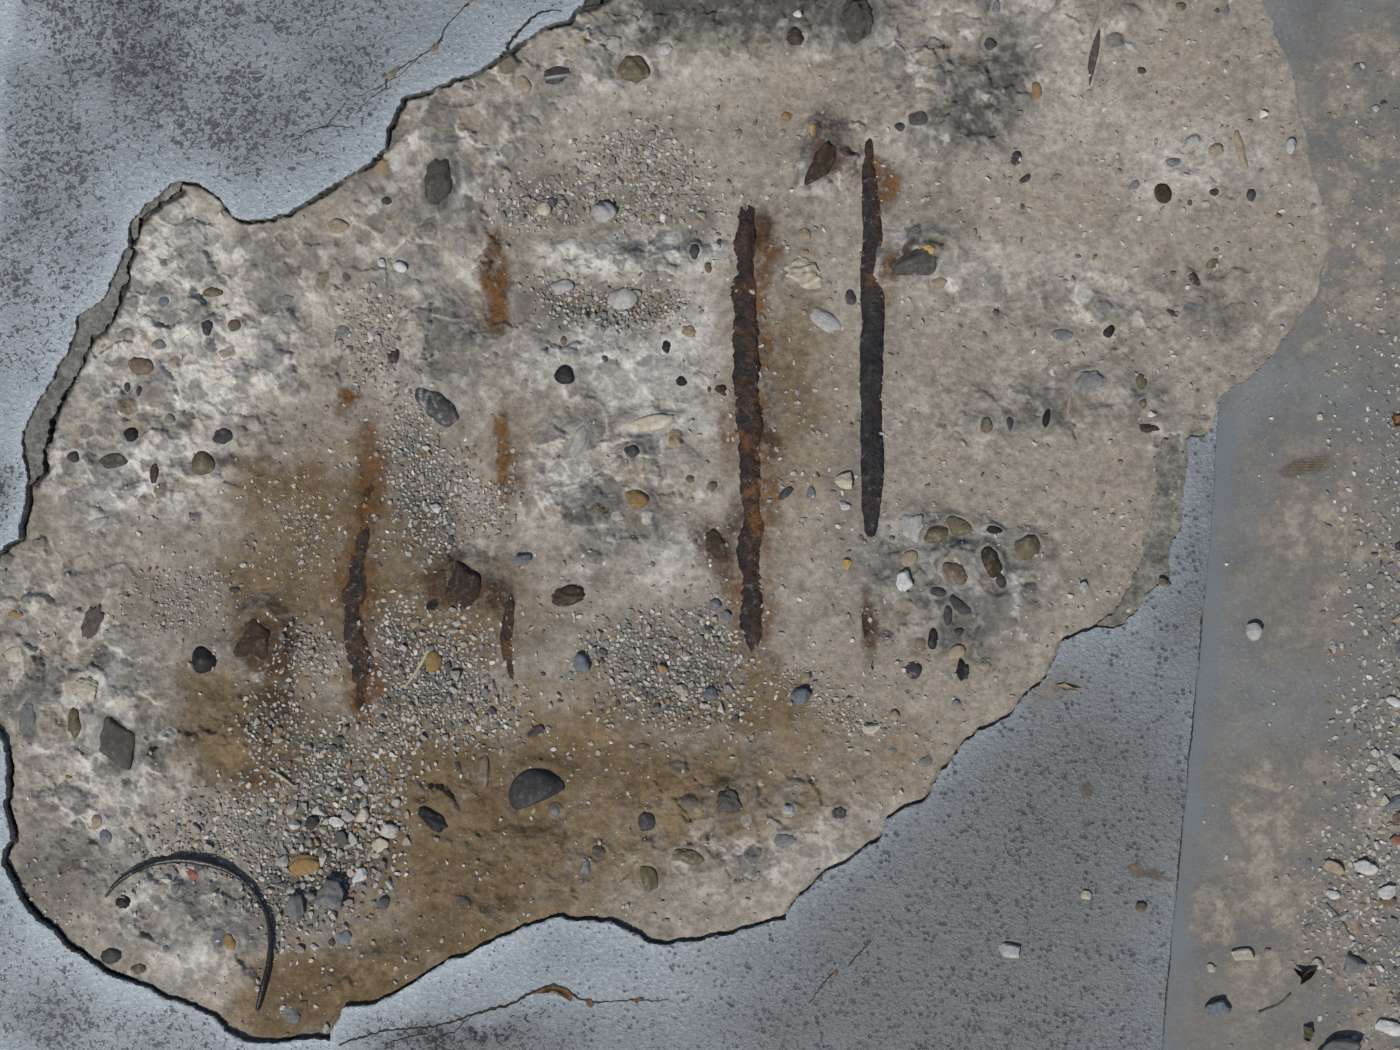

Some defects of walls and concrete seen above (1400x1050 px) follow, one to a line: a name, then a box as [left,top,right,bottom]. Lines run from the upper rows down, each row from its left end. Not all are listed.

crack [280,0,476,158]
crack [505,10,561,51]
rust [870,156,899,204]
rust [481,235,508,330]
spalling [23,248,135,485]
spalling [415,388,459,427]
spalling [731,205,764,653]
spalling [859,138,885,537]
rust [182,427,399,796]
rust [411,557,513,656]
spalling [99,716,135,770]
crack [338,984,662,1046]